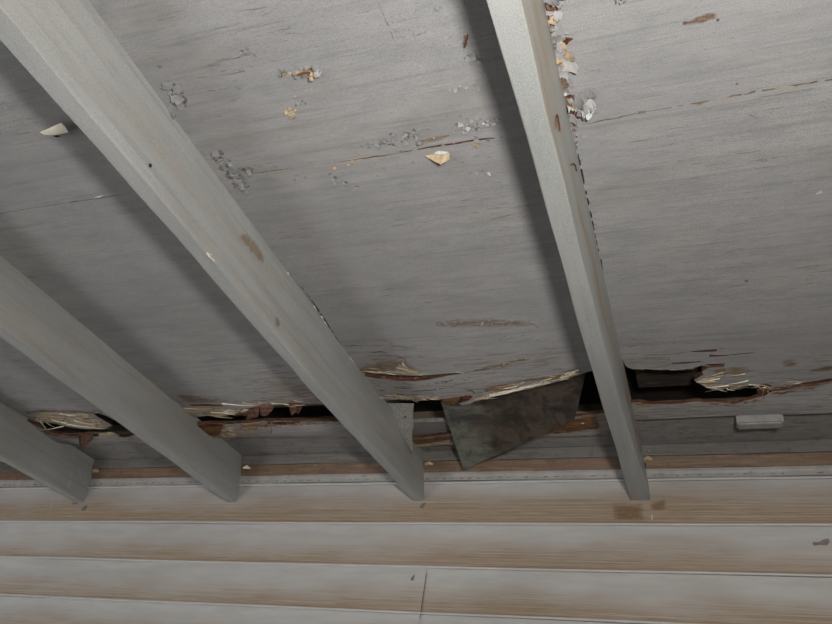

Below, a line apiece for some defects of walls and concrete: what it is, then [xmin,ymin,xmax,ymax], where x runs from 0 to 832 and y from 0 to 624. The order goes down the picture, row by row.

peeling [277,62,322,81]
crack [583,79,832,125]
peeling [543,0,604,271]
peeling [204,136,503,195]